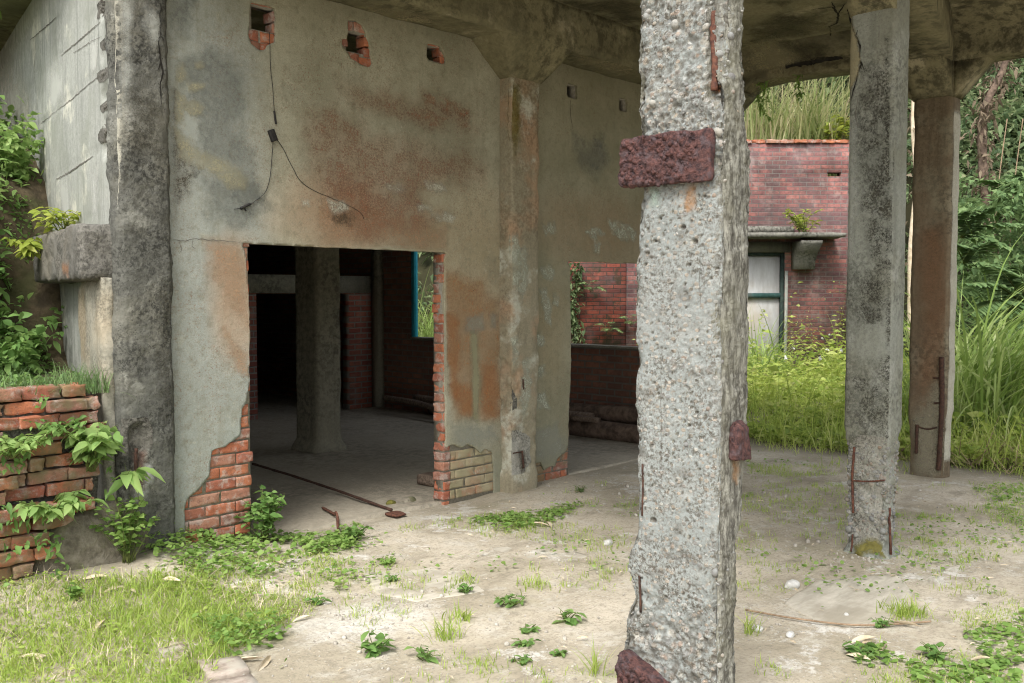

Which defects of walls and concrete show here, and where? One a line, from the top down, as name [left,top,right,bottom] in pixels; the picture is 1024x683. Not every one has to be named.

spalling [248,3,275,50]
spalling [342,21,371,67]
crack [780,3,863,125]
rust [618,131,697,210]
spalling [184,404,253,542]
spalling [449,448,493,499]
spalling [508,430,568,482]